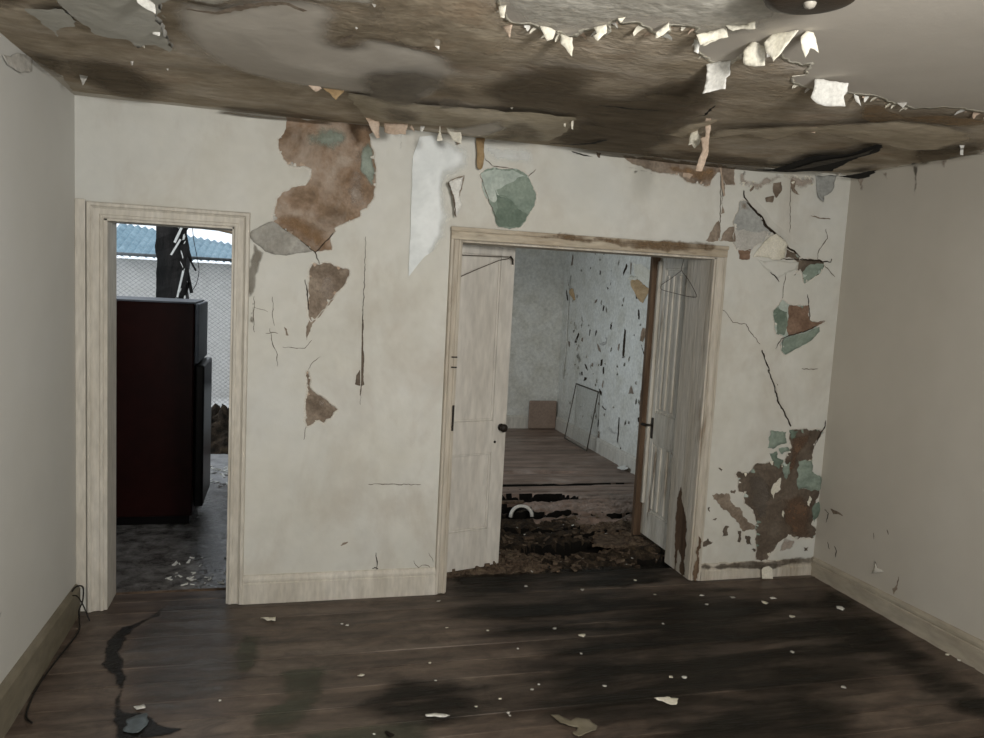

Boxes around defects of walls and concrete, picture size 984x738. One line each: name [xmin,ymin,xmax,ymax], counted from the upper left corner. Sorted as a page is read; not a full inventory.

damp [32,57,155,100]
damp [378,0,509,54]
damp [491,68,770,172]
peeling [633,21,755,94]
peeling [743,30,819,67]
peeling [792,79,907,112]
damp [914,147,980,180]
flaking render [271,117,425,338]
crack [706,176,830,298]
crack [355,237,366,405]
crack [723,310,795,427]
spalling [708,421,826,561]